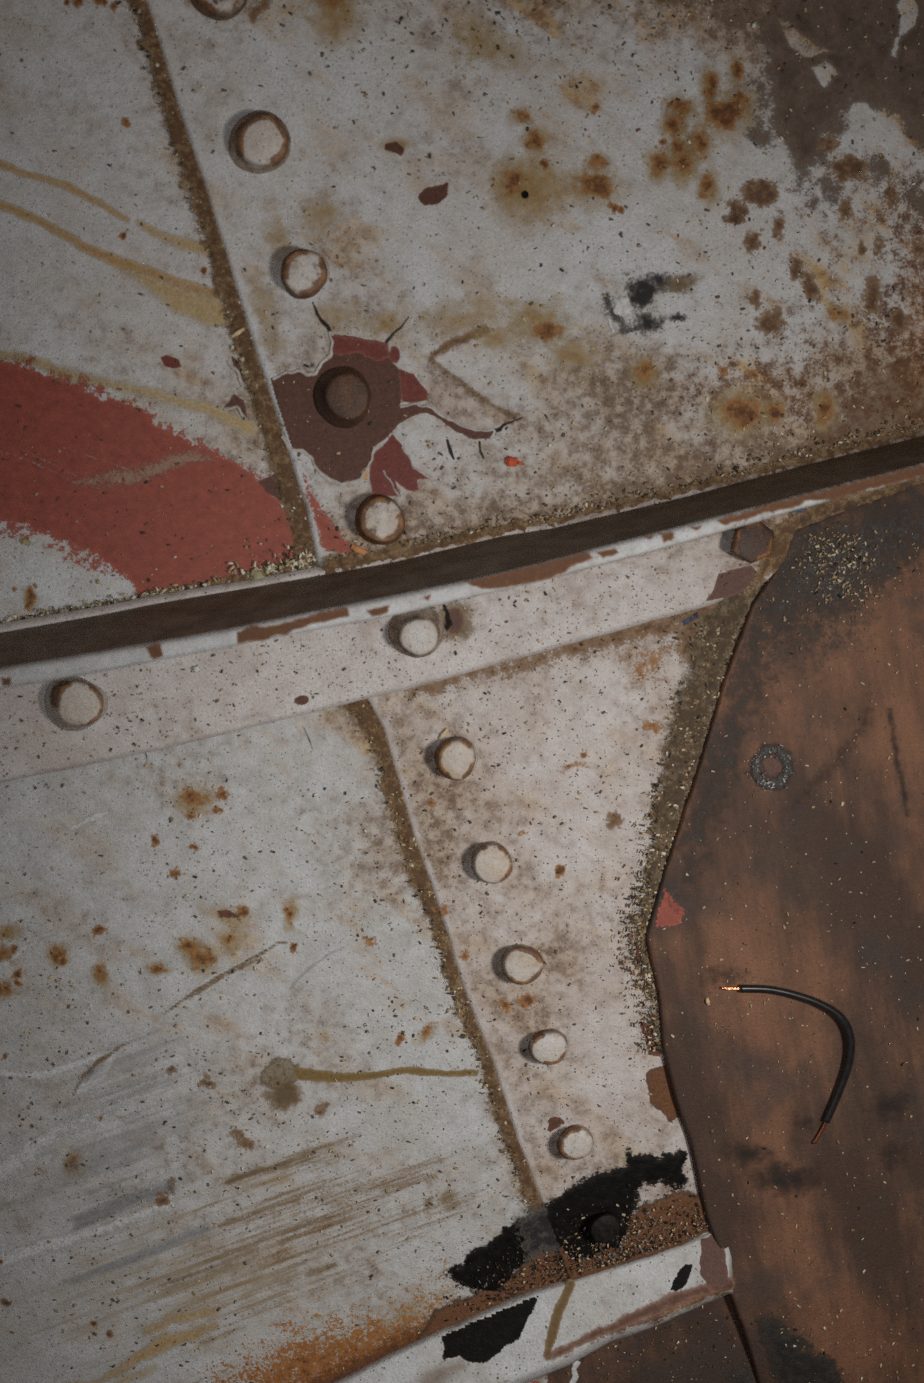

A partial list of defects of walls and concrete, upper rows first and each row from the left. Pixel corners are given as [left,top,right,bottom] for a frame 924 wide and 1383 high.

rust [510,109,549,169]
rust [570,151,625,215]
peeling [146,644,163,660]
peeling [237,605,390,643]
peeling [423,594,473,639]
rust [179,786,230,820]
rust [606,810,624,830]
rust [0,926,23,997]
rust [177,905,250,970]
rust [283,897,298,954]
rust [395,1022,432,1046]
rust [190,1189,735,1383]